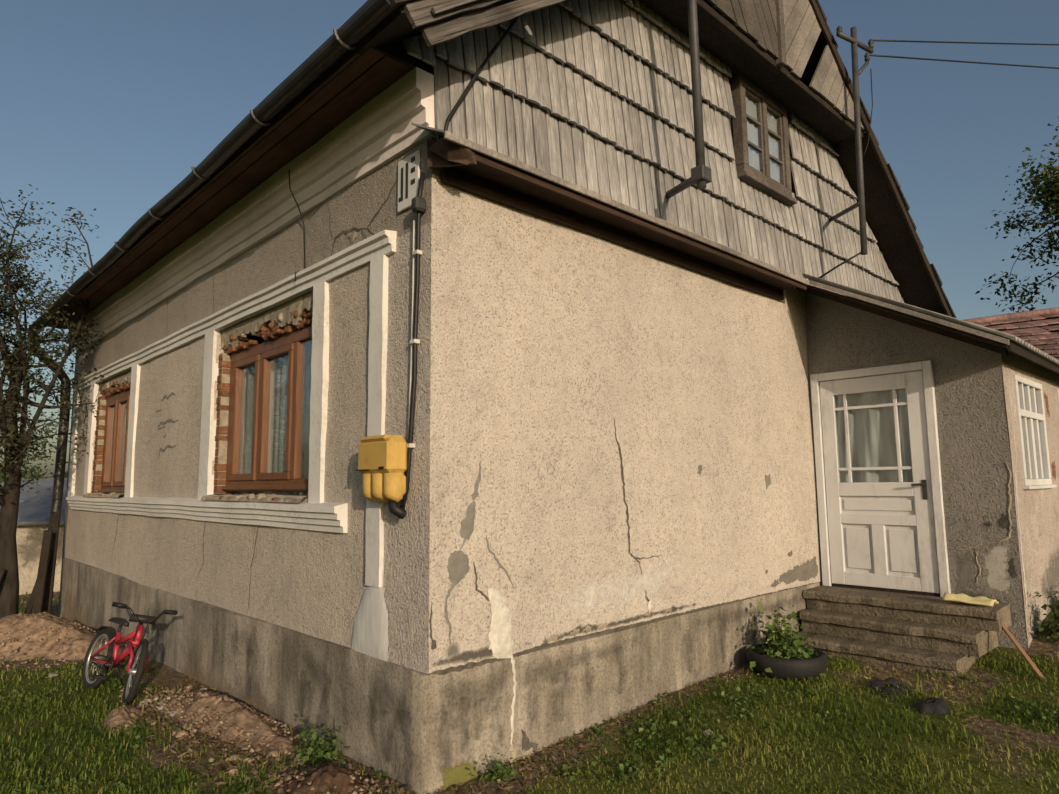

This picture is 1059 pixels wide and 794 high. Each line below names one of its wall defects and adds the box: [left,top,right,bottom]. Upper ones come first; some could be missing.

crack [366,180,397,229]
crack [429,419,815,675]
flaking render [950,463,1017,594]
leakage [544,604,695,643]
leakage [438,645,493,664]